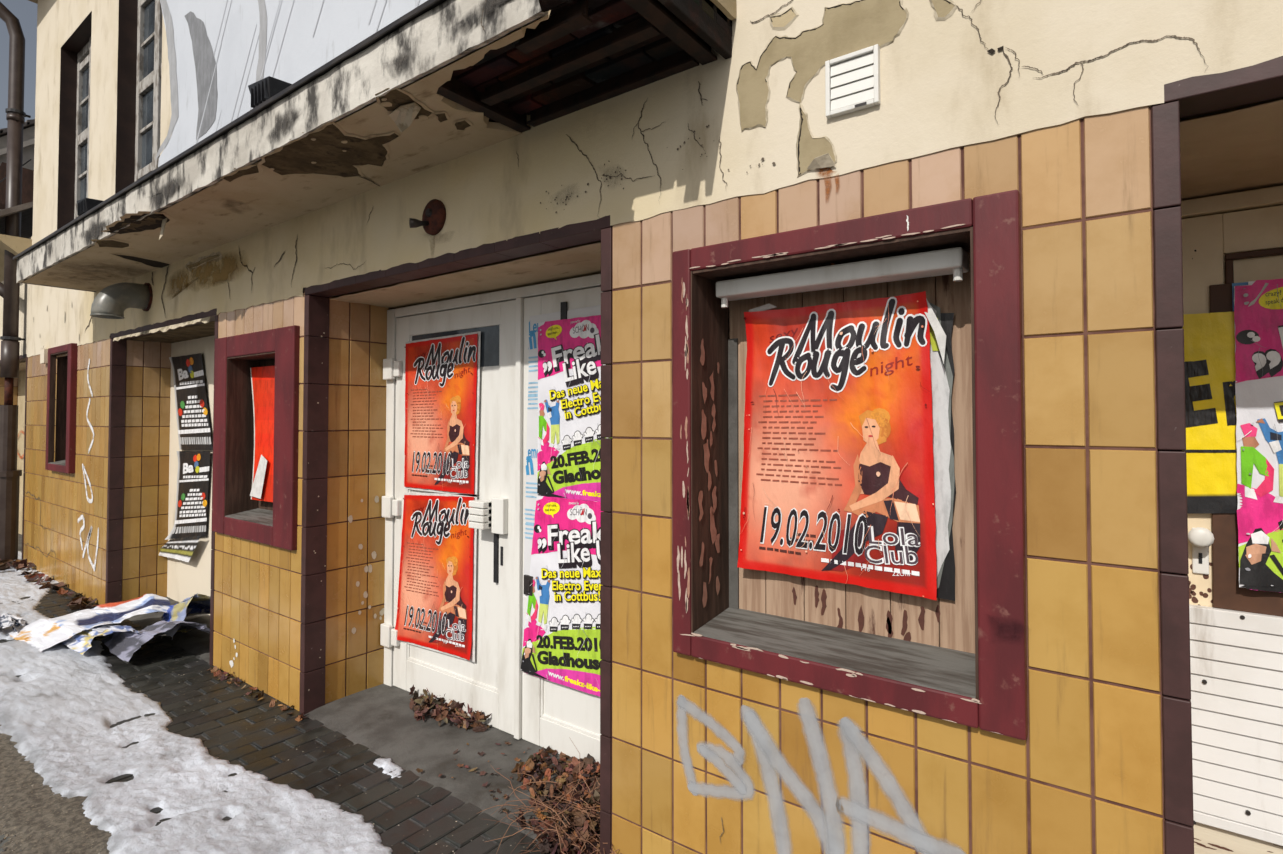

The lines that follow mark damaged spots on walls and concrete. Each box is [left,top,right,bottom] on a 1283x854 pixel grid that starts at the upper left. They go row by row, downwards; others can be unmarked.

water stain [387,54,410,72]
flaking render [736,0,909,178]
crack [956,0,1209,125]
water stain [268,109,297,141]
spalling [217,88,473,183]
crack [567,81,727,212]
water stain [152,178,182,207]
water stain [81,221,105,245]
spalling [91,211,223,272]
crack [228,234,298,296]
peeling [815,224,965,249]
peeling [677,252,788,613]